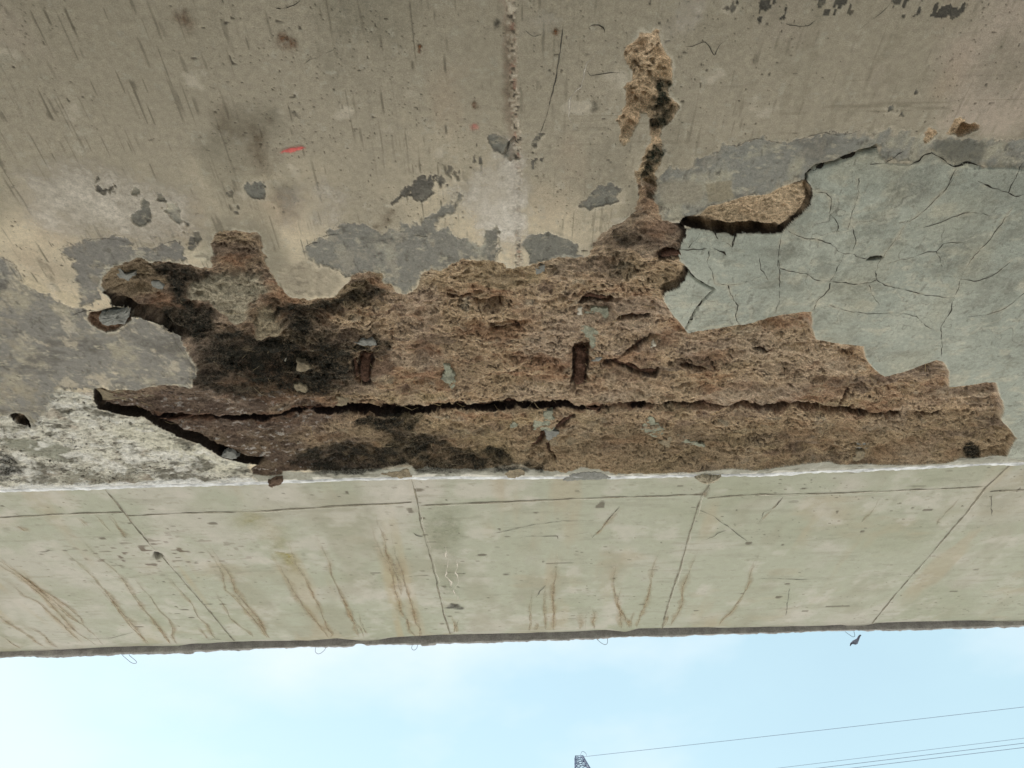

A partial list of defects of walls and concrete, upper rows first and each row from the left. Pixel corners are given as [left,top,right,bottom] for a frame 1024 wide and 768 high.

leakage [155,262,390,398]
spalling [0,29,1024,488]
crack [678,133,1024,355]